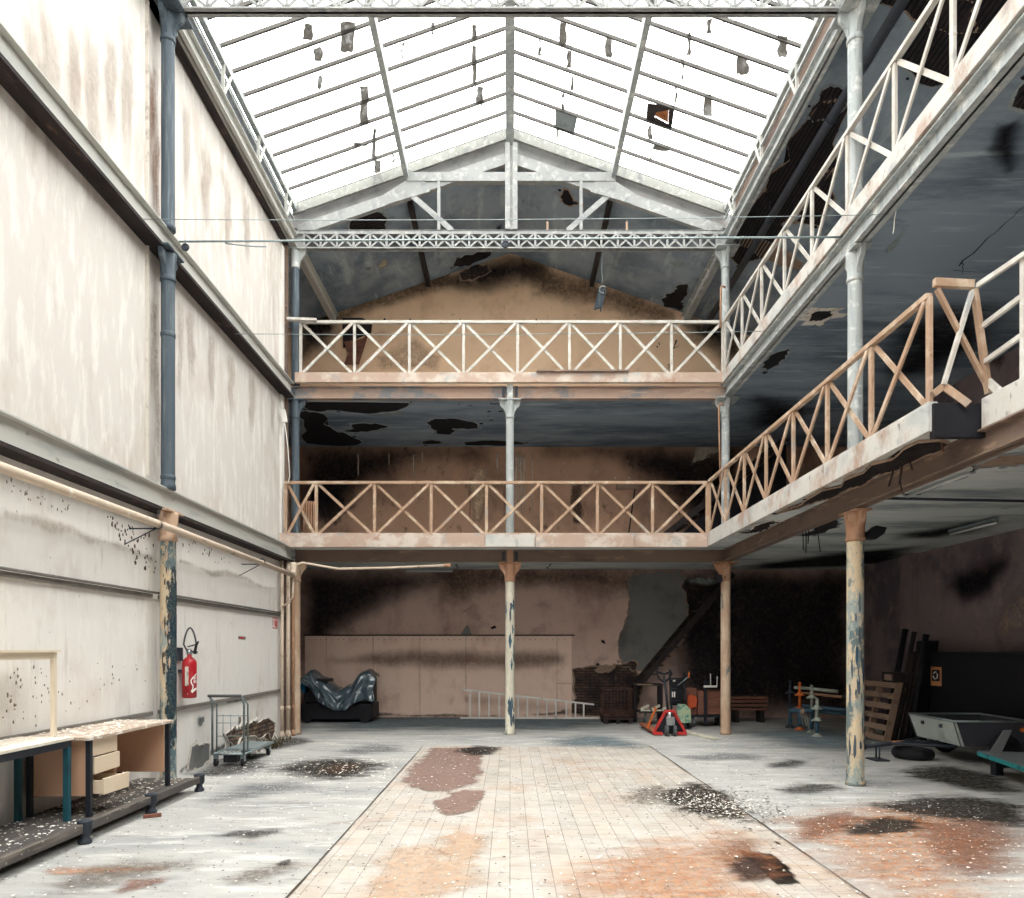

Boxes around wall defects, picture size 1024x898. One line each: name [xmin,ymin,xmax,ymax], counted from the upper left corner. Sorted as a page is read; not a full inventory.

flaking render [556,187,585,207]
flaking render [730,83,848,270]
flaking render [451,252,497,284]
flaking render [661,283,689,311]
flaking render [800,307,847,326]
flaking render [760,347,791,374]
flaking render [300,401,412,447]
flaking render [420,403,527,446]
flaking render [735,439,952,537]
peeling [0,516,177,749]
flaking render [572,570,715,717]
peeling [849,593,864,708]